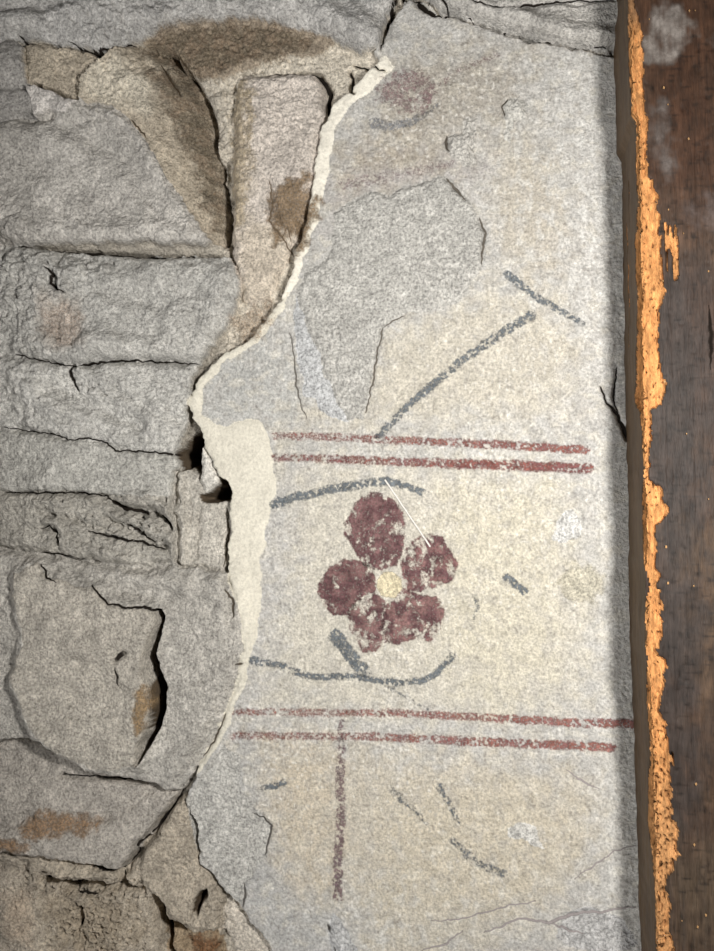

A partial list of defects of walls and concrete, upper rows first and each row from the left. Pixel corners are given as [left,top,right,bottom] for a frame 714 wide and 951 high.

spalling [24,44,98,120]
damp [146,24,310,232]
damp [266,172,323,259]
spalling [10,562,166,772]
peeling [187,745,273,911]
spalling [166,919,228,951]